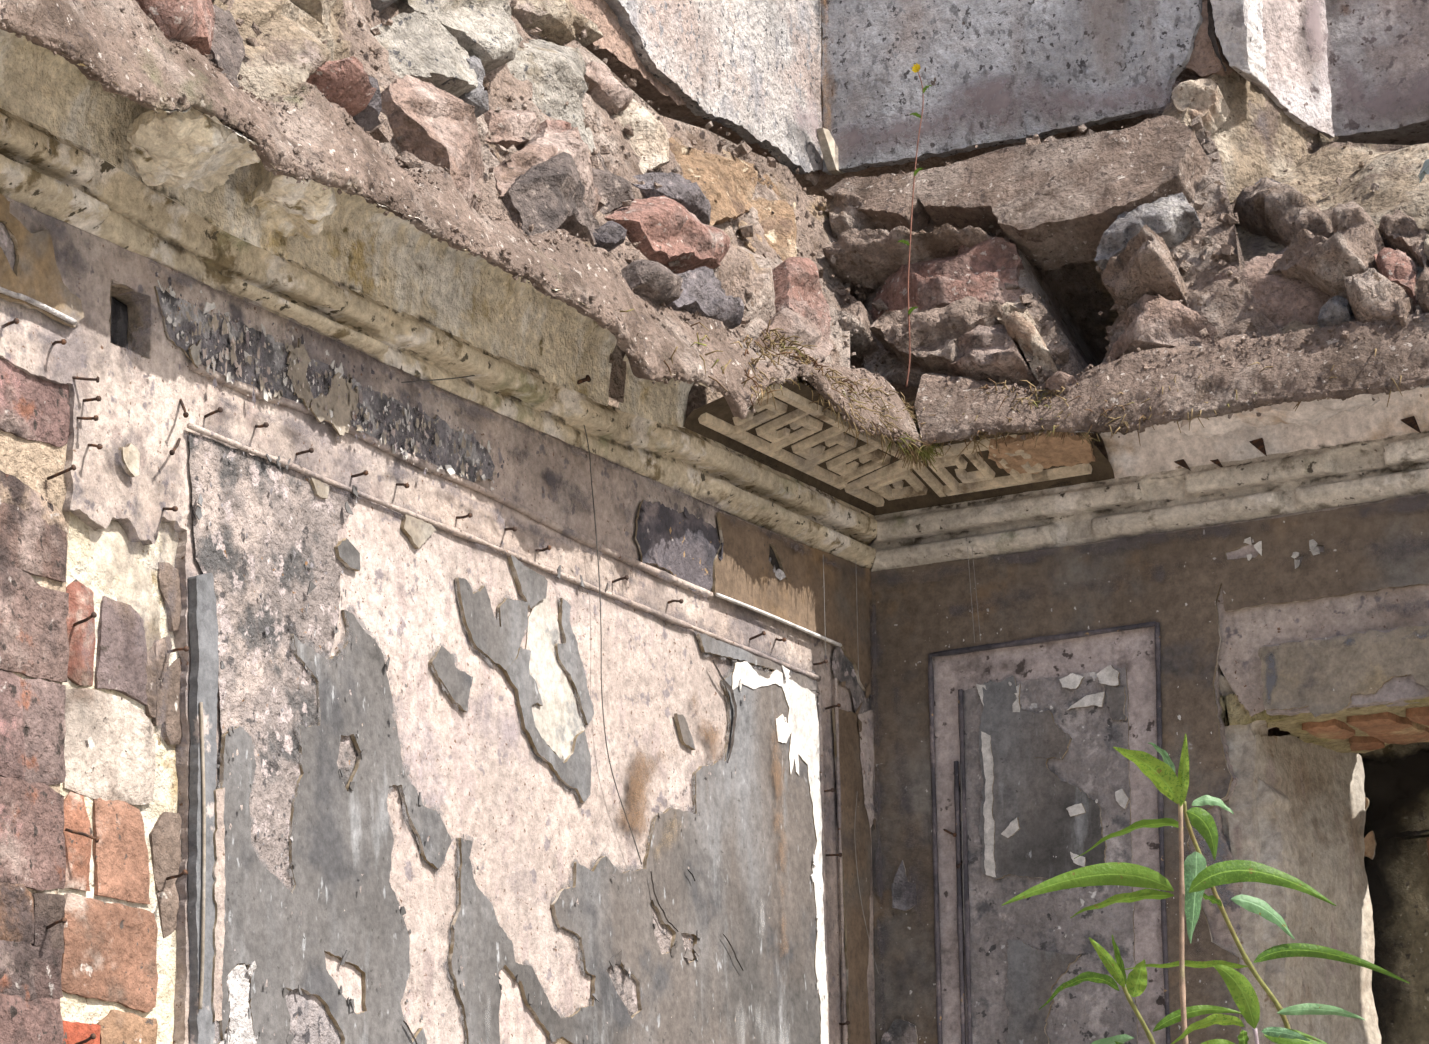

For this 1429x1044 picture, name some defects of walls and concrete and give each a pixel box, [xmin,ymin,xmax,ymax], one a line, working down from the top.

spalling [1210,0,1269,89]
peeling [816,127,844,175]
peeling [0,221,21,270]
peeling [154,272,509,500]
spalling [1180,394,1380,438]
peeling [67,433,831,1044]
peeling [858,709,877,830]
peeling [965,665,1130,894]